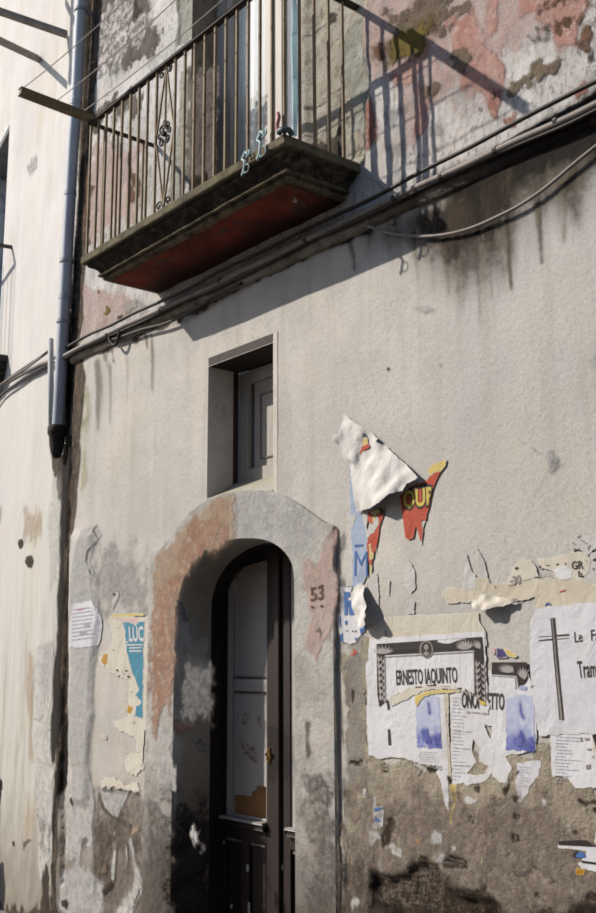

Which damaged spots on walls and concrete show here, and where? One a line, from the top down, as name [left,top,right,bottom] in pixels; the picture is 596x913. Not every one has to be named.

spalling [176,0,192,45]
spalling [168,72,189,201]
leakage [518,89,596,136]
leakage [329,229,372,249]
leakage [386,125,596,287]
peeling [80,285,145,342]
peeling [147,494,235,791]
peeling [338,635,596,913]
peeling [59,789,144,913]